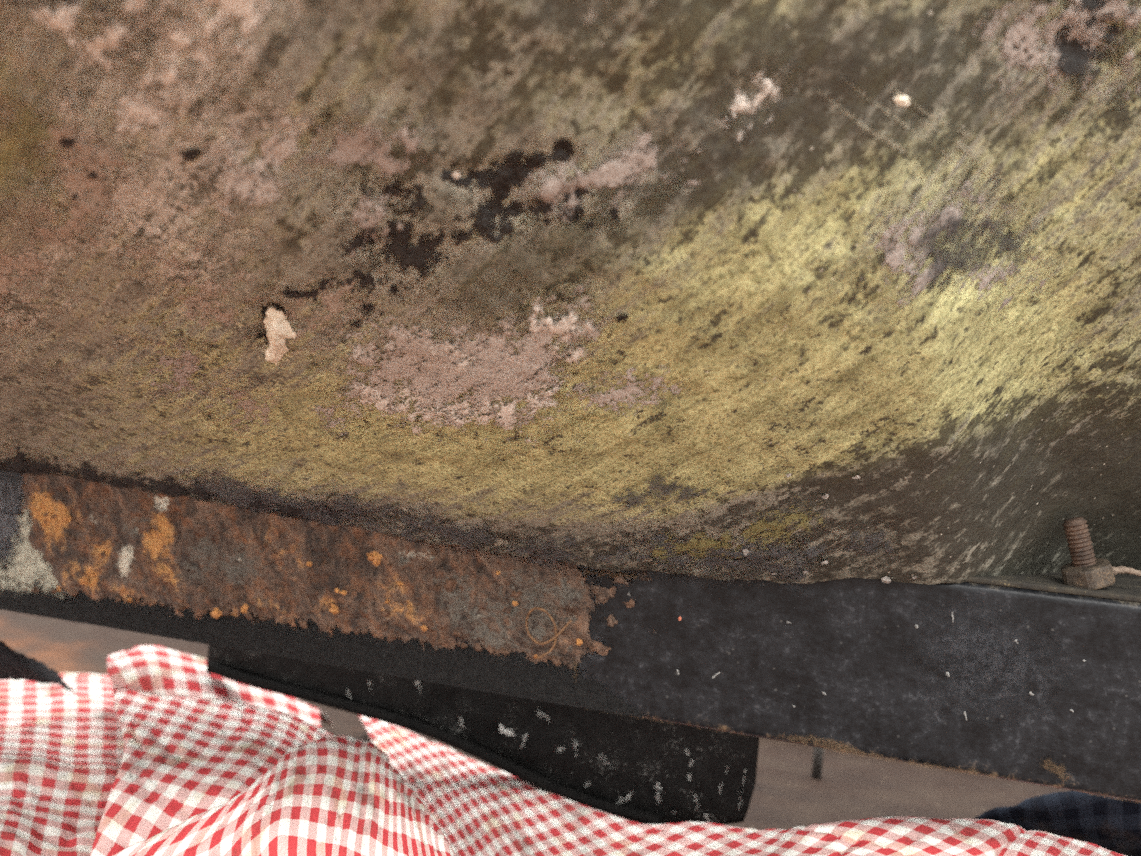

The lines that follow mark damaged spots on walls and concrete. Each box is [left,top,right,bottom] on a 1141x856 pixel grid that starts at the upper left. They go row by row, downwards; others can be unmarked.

leakage [193,92,437,257]
leakage [510,129,702,223]
leakage [818,91,906,152]
leakage [149,321,278,431]
rust [18,473,651,669]
leakage [183,469,894,587]